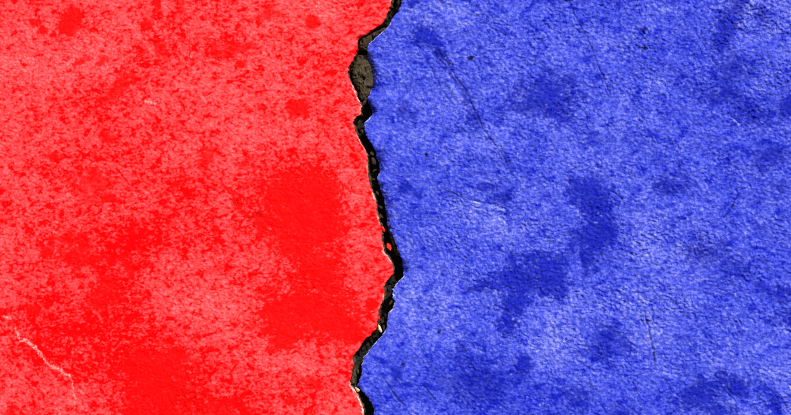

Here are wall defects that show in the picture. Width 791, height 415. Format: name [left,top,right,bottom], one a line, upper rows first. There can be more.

crack [332,0,404,415]